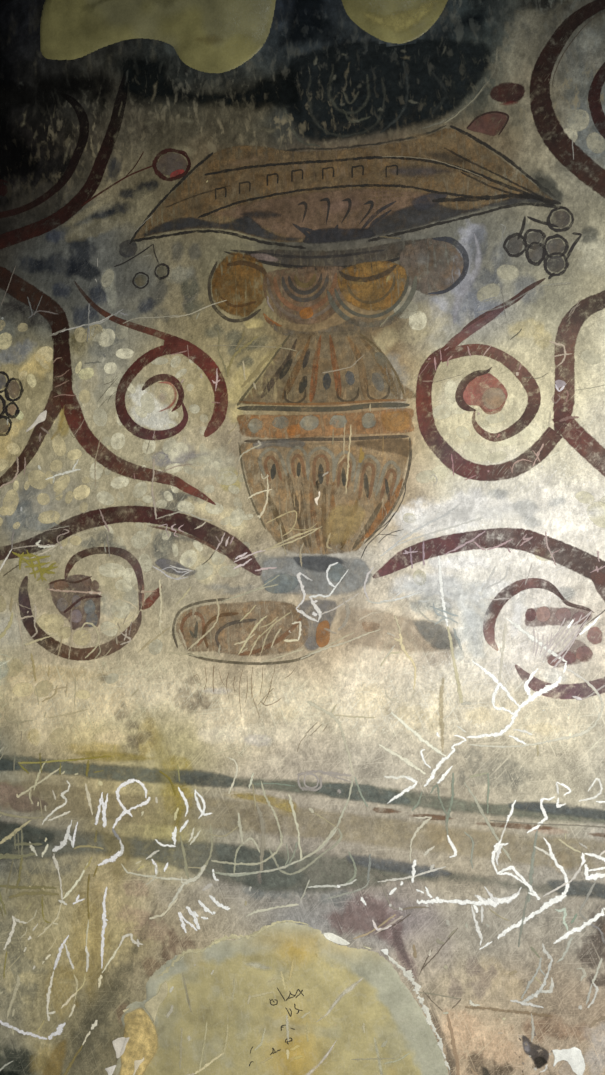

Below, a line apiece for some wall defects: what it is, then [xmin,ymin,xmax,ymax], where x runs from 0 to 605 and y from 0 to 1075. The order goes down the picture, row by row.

crack [421,928,462,1011]
spalling [105,981,168,1075]
spalling [519,1032,585,1075]